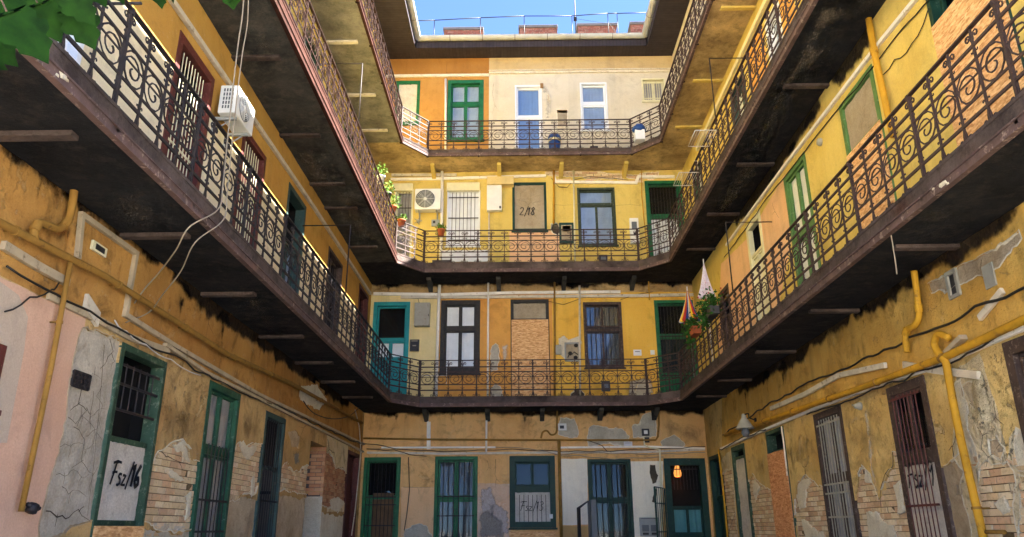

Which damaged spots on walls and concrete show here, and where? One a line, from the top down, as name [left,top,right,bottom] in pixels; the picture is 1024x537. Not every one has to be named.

flaking render [927,229,1023,294]
crack [46,340,114,525]
flaking render [143,438,200,537]
flaking render [225,440,262,537]
peeling [299,384,327,410]
flaking render [320,452,346,537]
flaking render [558,412,685,447]
flaking render [794,474,829,537]
flaking render [857,451,910,537]
flaking render [943,377,1024,537]